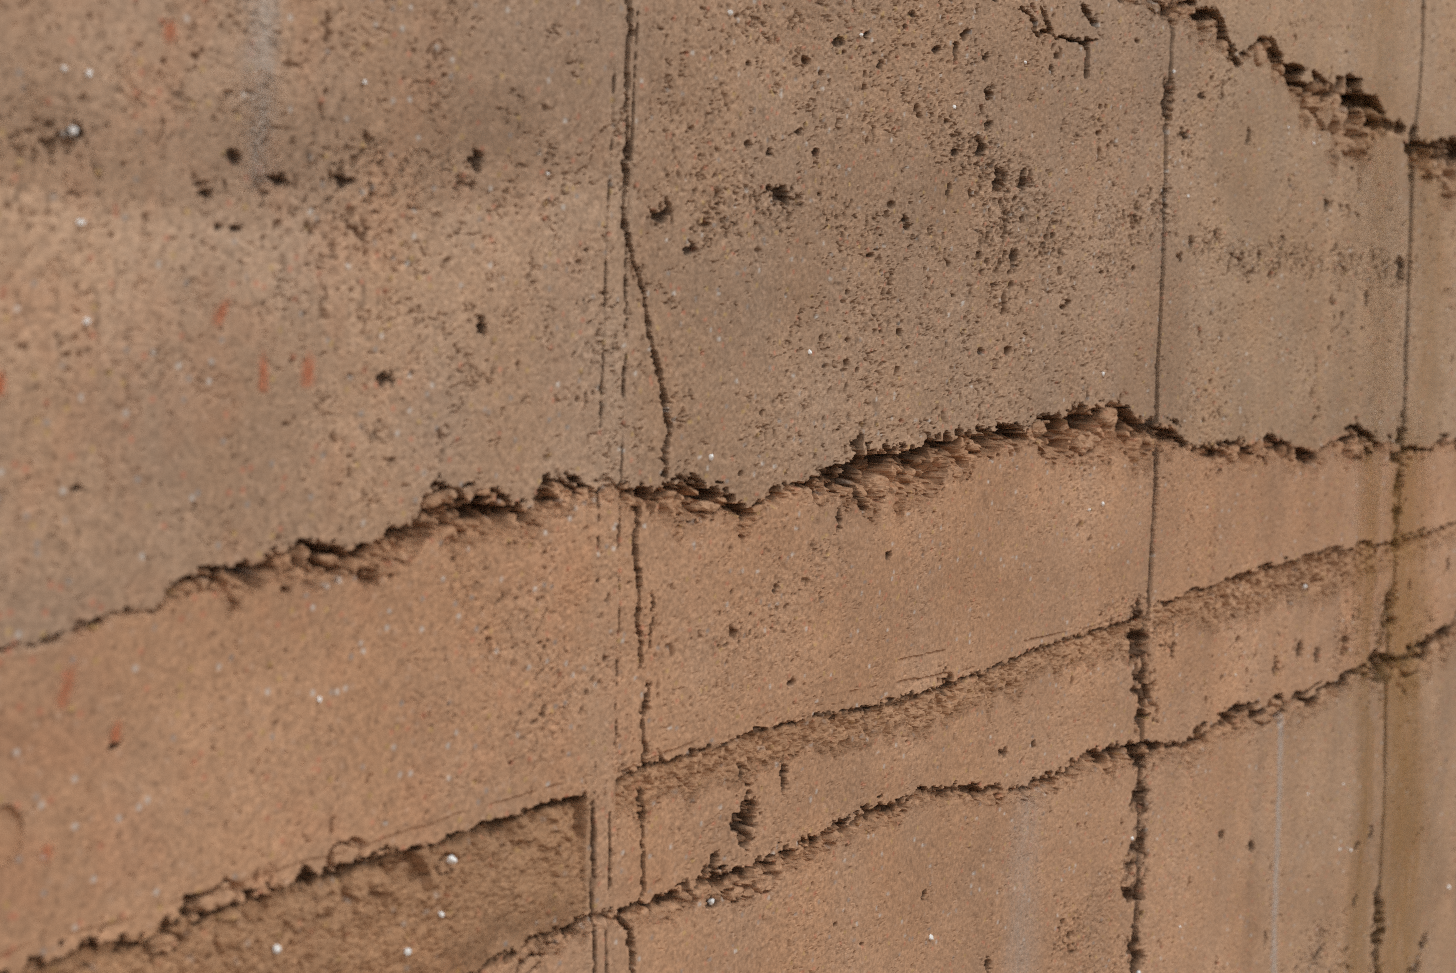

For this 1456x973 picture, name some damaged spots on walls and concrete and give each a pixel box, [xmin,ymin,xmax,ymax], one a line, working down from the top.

crack [1039,13,1090,68]
crack [157,406,1456,614]
spalling [23,795,586,973]
crack [468,611,1456,973]